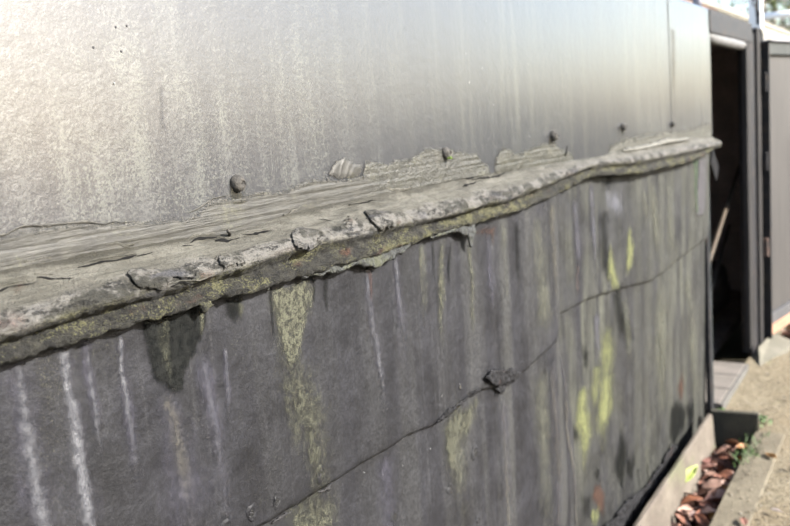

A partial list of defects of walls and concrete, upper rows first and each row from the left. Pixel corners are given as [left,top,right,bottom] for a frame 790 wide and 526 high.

peeling [288,227,320,252]
peeling [345,209,398,230]
peeling [696,159,706,216]
leakage [144,306,206,392]
leakage [25,423,44,519]
leakage [61,353,93,526]
leakage [120,340,133,437]
leakage [203,364,218,431]
peeling [616,434,634,480]
peeling [670,402,694,442]